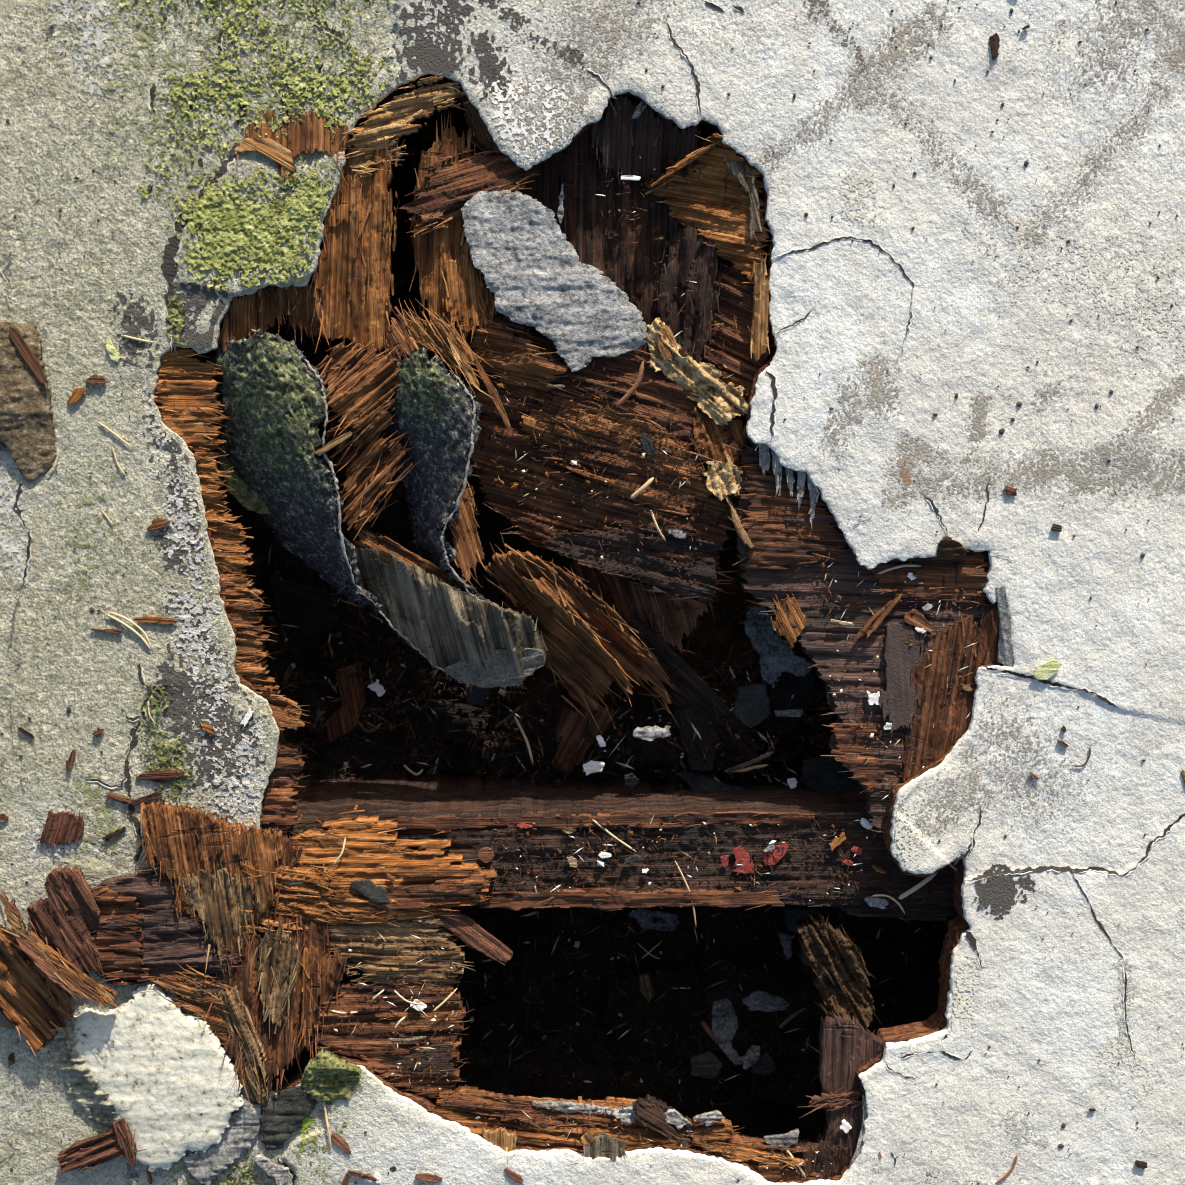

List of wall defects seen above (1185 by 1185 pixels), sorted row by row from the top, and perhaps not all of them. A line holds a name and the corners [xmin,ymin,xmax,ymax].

water stain [471,0,697,165]
water stain [757,0,1185,250]
peeling [108,292,160,369]
peeling [168,280,230,349]
crack [772,236,915,363]
peeling [142,414,204,573]
water stain [810,350,1185,515]
peeling [146,597,270,796]
peeling [633,725,671,741]
peeling [995,587,1013,667]
crack [954,805,1185,1066]
crack [886,1034,973,1079]